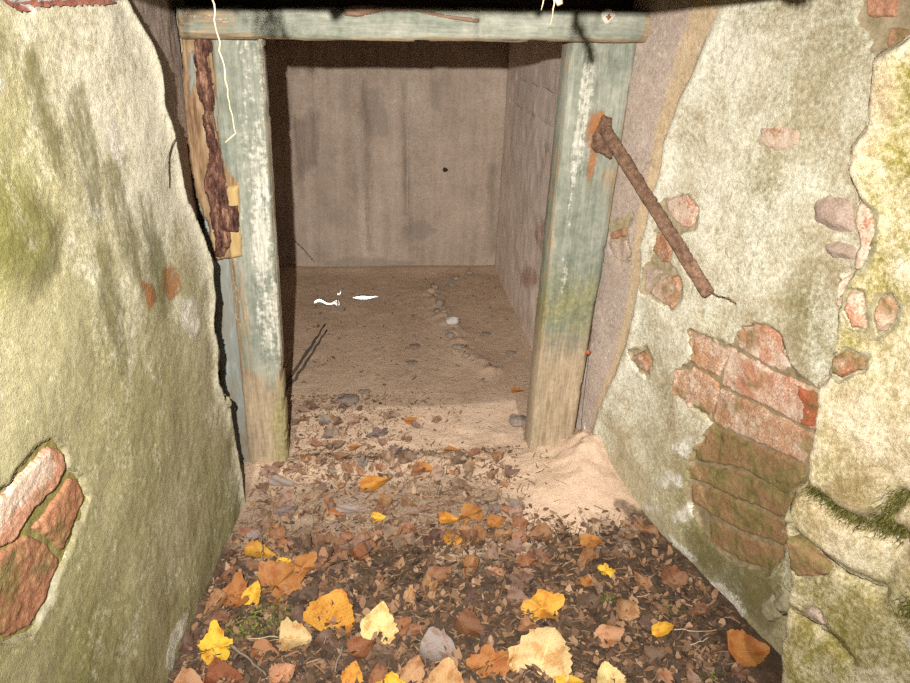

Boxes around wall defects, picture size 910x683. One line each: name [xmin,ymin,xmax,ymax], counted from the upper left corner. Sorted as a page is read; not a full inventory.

spalling [857,0,910,56]
rust [586,112,736,304]
spalling [639,226,683,312]
spalling [660,193,699,236]
spalling [814,195,904,341]
spalling [831,346,871,384]
spalling [670,321,836,580]
spalling [0,437,92,647]